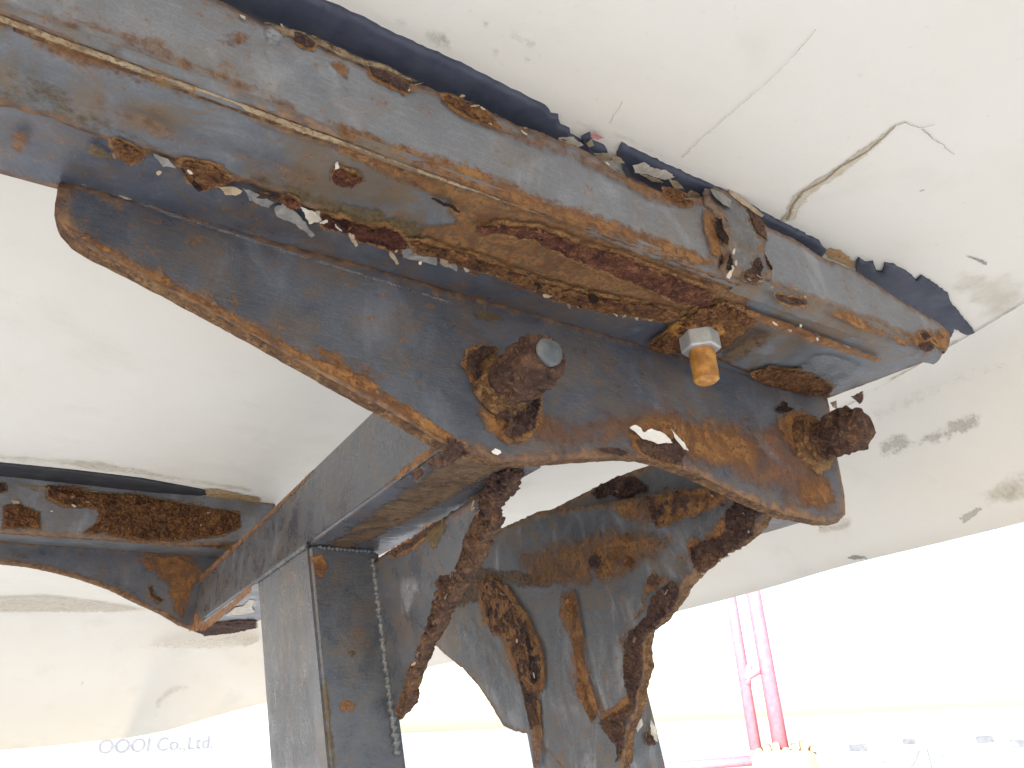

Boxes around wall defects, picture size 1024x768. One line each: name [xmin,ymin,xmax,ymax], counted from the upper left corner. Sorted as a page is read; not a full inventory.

peeling [559,133,673,183]
crack [786,122,954,220]
spalling [274,204,437,265]
rust [89,124,881,363]
rust [831,311,950,352]
rust [480,366,836,510]
peeling [630,425,688,450]
damp [926,417,975,441]
rust [0,470,314,636]
rust [67,226,545,768]
rust [588,475,764,579]
rust [559,573,678,763]